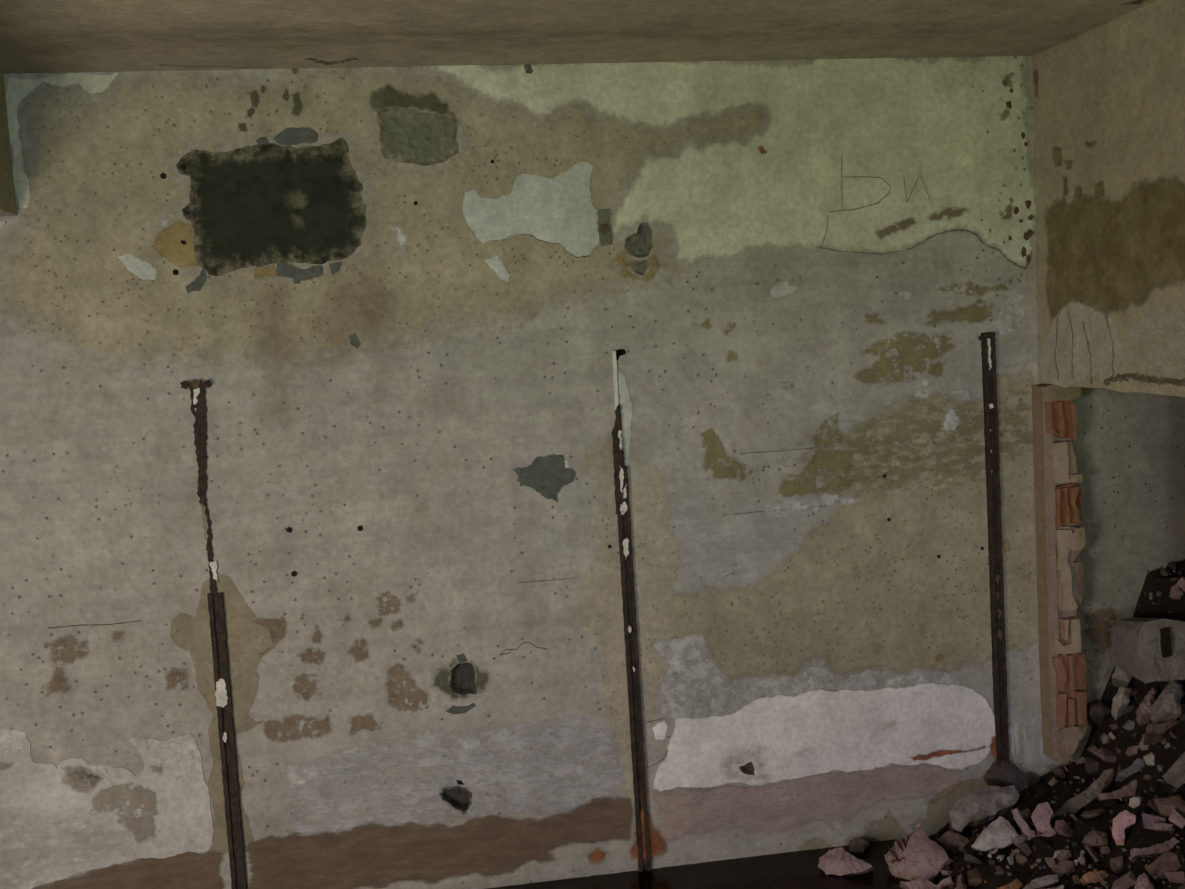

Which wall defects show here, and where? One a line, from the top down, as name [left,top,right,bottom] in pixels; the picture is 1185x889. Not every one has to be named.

water stain [284,190,308,228]
spalling [0,56,1036,359]
rust [189,386,218,600]
rust [612,404,627,515]
spalling [282,301,1122,833]
water stain [33,852,224,889]
water stain [246,798,632,889]
rust [630,809,666,860]
water stain [652,764,961,878]